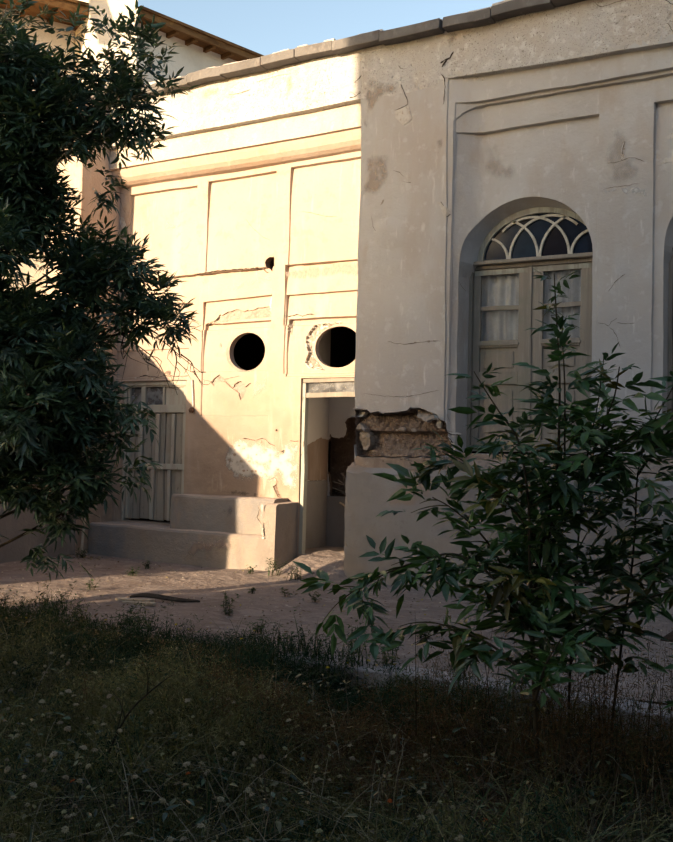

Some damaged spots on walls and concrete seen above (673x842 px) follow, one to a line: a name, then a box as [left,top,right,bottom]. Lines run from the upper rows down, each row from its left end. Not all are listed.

crack [440,50,455,105]
spalling [305,321,342,371]
spalling [328,407,452,464]
flaking render [226,436,299,497]